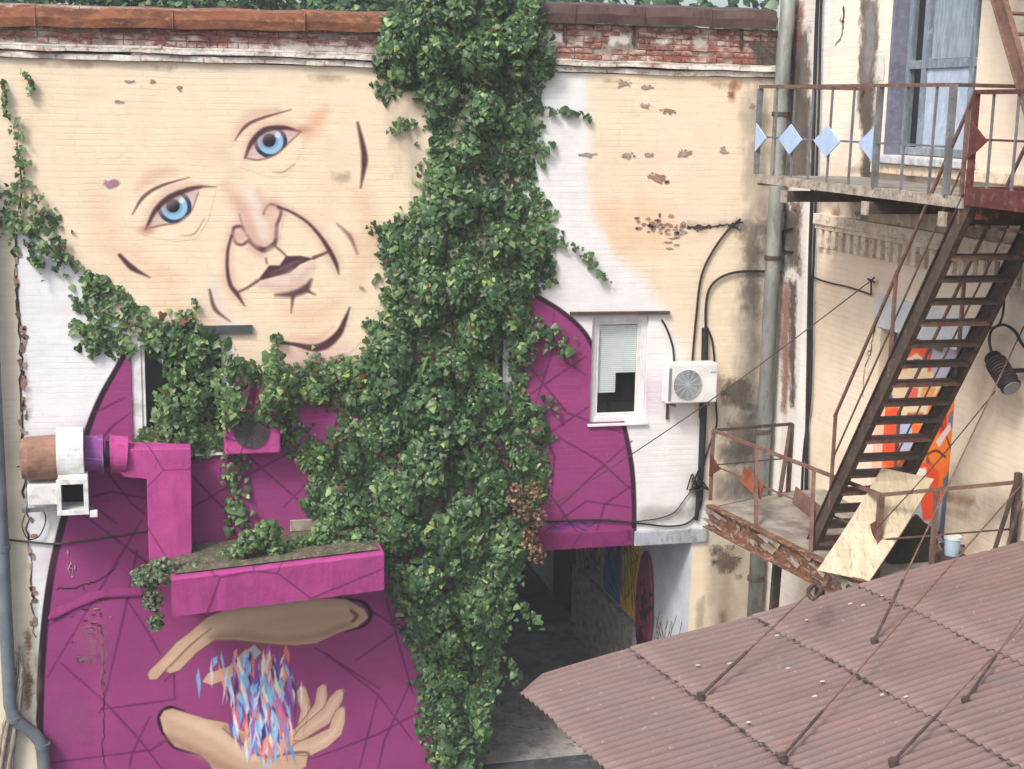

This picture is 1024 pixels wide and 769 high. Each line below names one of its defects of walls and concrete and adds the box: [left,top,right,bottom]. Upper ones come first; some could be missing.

damp [858,0,878,137]
spalling [648,172,669,184]
damp [861,153,871,178]
peeling [634,213,688,249]
damp [782,202,801,274]
damp [721,234,761,426]
spalling [15,311,28,434]
spalling [27,516,38,571]
damp [712,546,738,573]
peeling [750,533,858,589]
crack [92,627,110,767]